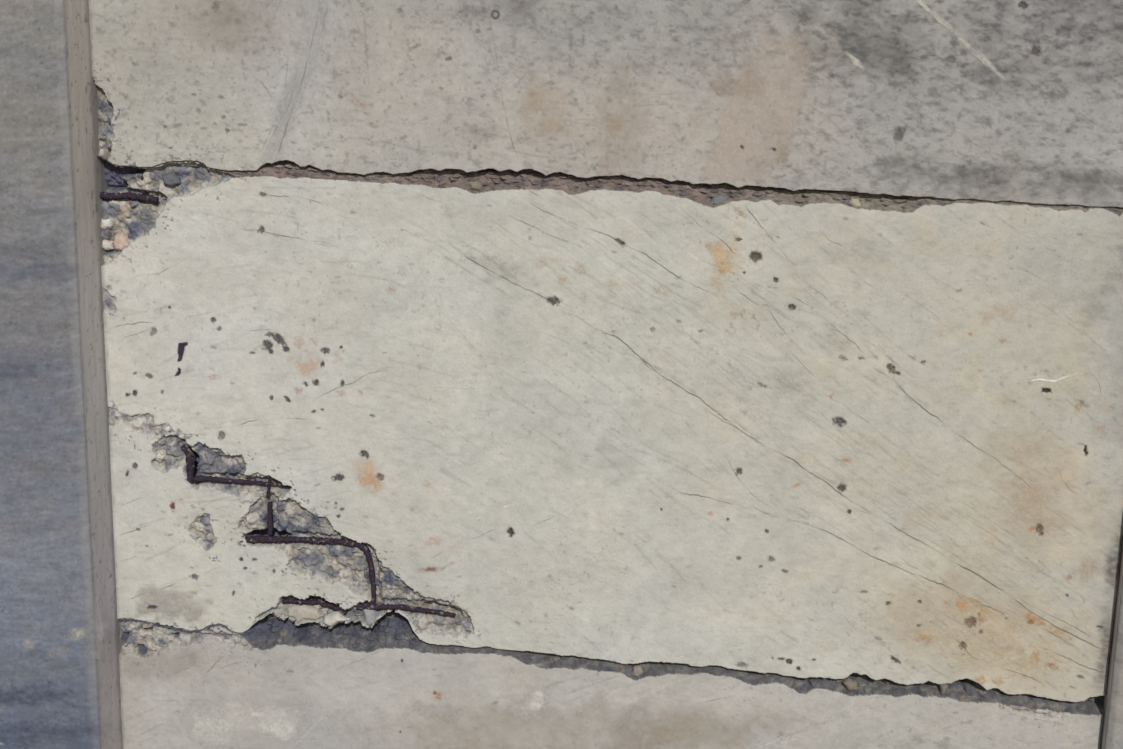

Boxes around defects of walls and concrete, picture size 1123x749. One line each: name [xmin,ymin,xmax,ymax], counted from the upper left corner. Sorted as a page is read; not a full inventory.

spalling [93,64,246,267]
spalling [102,280,126,322]
spalling [108,390,482,670]